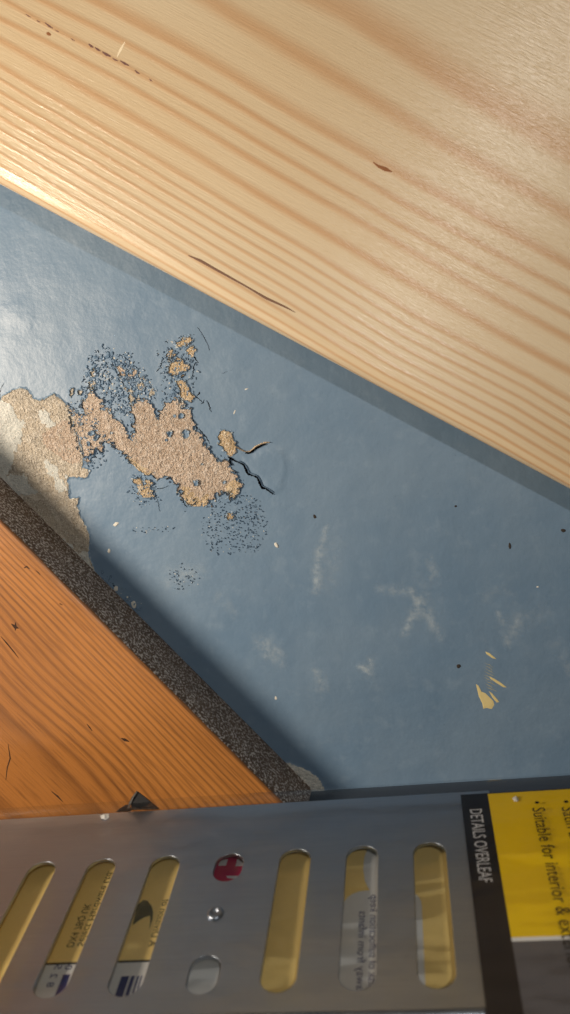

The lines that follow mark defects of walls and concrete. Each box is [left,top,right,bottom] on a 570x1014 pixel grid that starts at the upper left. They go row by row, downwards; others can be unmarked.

crack [156,327,211,442]
peeling [0,334,270,573]
crack [228,442,274,495]